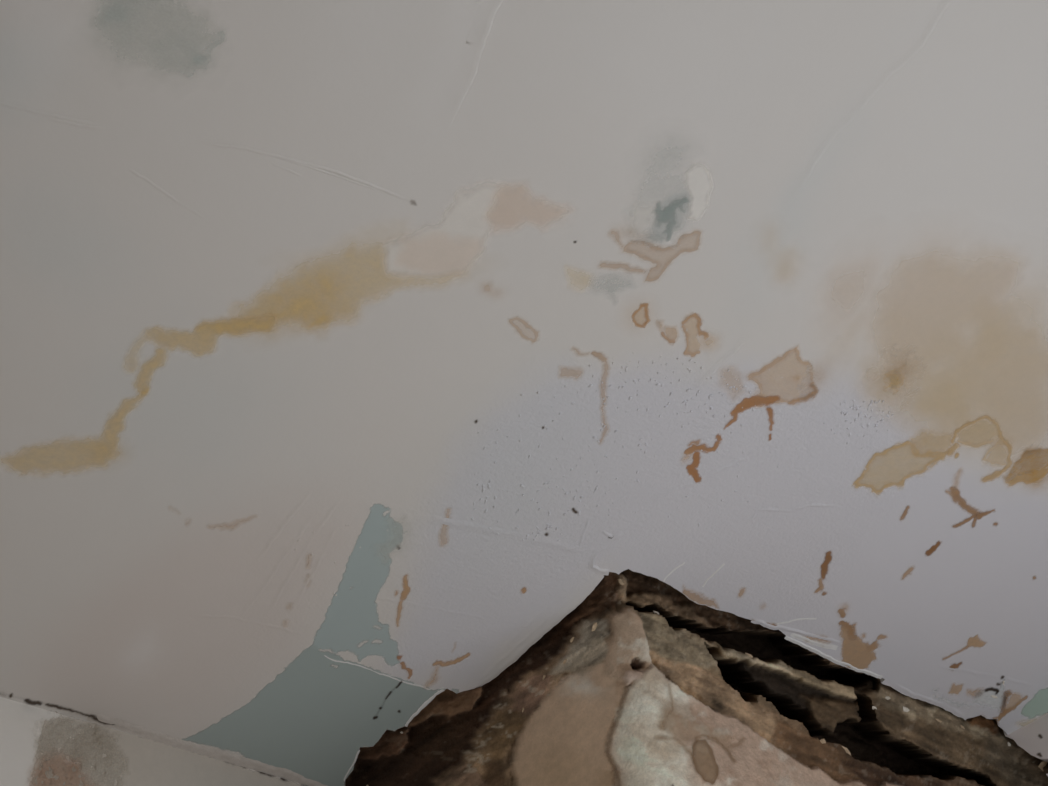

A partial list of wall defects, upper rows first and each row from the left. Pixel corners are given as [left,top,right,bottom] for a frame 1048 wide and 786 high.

leakage [5,185,562,473]
leakage [632,303,650,328]
leakage [602,232,700,281]
leakage [661,313,709,356]
leakage [854,260,1048,494]
spalling [32,504,1048,786]